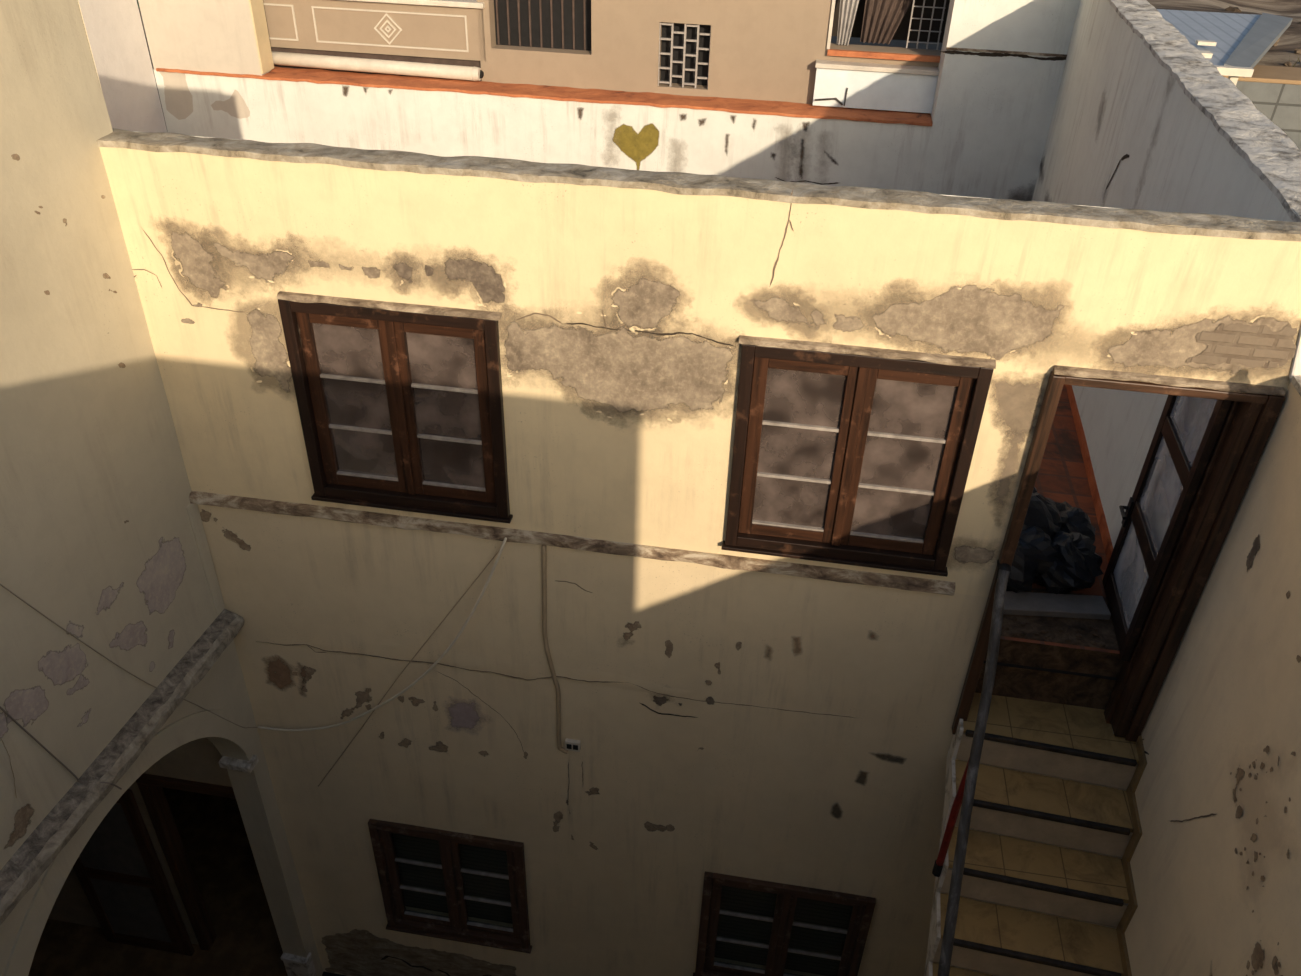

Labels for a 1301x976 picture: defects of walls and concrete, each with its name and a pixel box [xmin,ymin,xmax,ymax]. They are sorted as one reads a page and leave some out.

crack [770,177,838,285]
flaking render [171,232,506,324]
flaking render [247,308,292,392]
flaking render [504,278,733,421]
flaking render [751,283,1064,360]
flaking render [1107,315,1298,375]
flaking render [1246,534,1262,571]
peeling [1230,745,1295,889]
peeling [1246,942,1283,976]